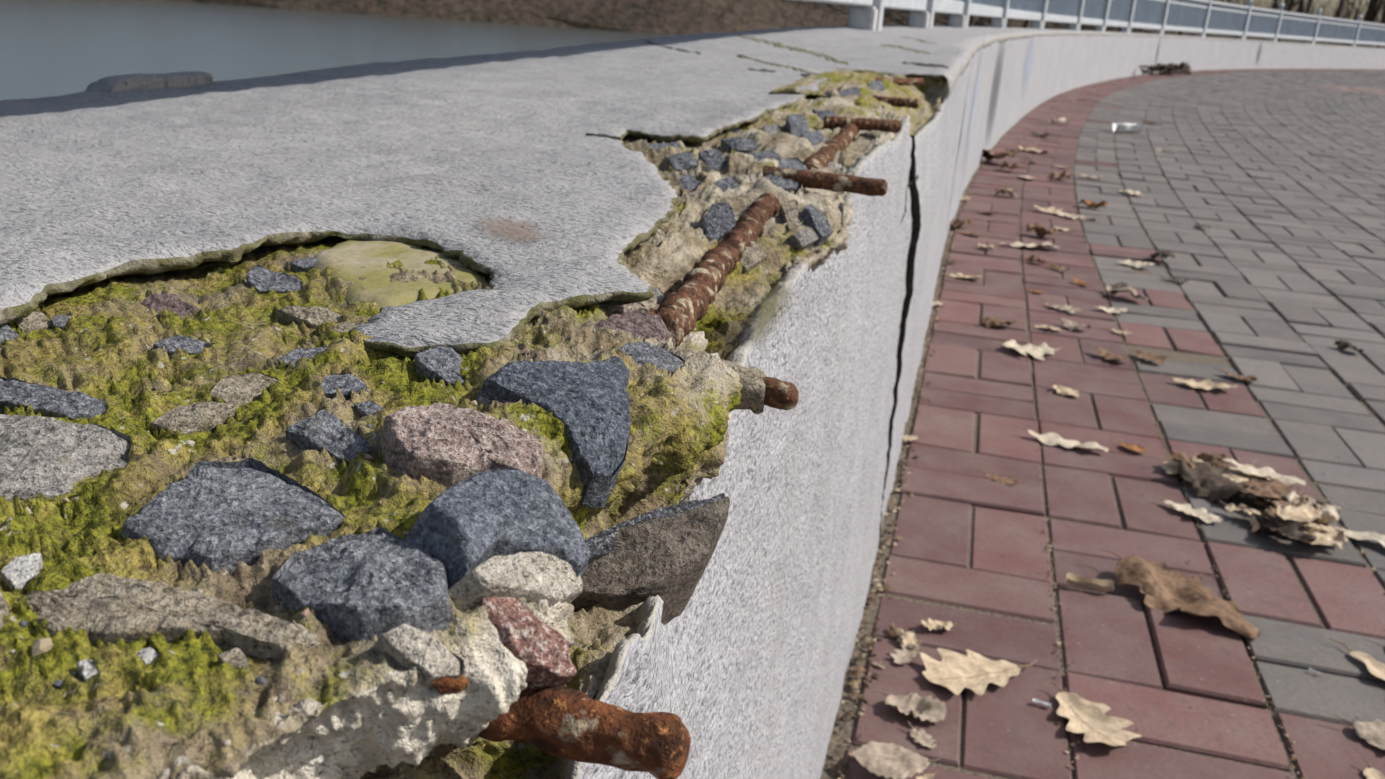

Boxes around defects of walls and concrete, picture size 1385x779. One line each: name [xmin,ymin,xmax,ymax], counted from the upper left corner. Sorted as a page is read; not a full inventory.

spalling [0,68,947,779]
crack [878,135,921,550]